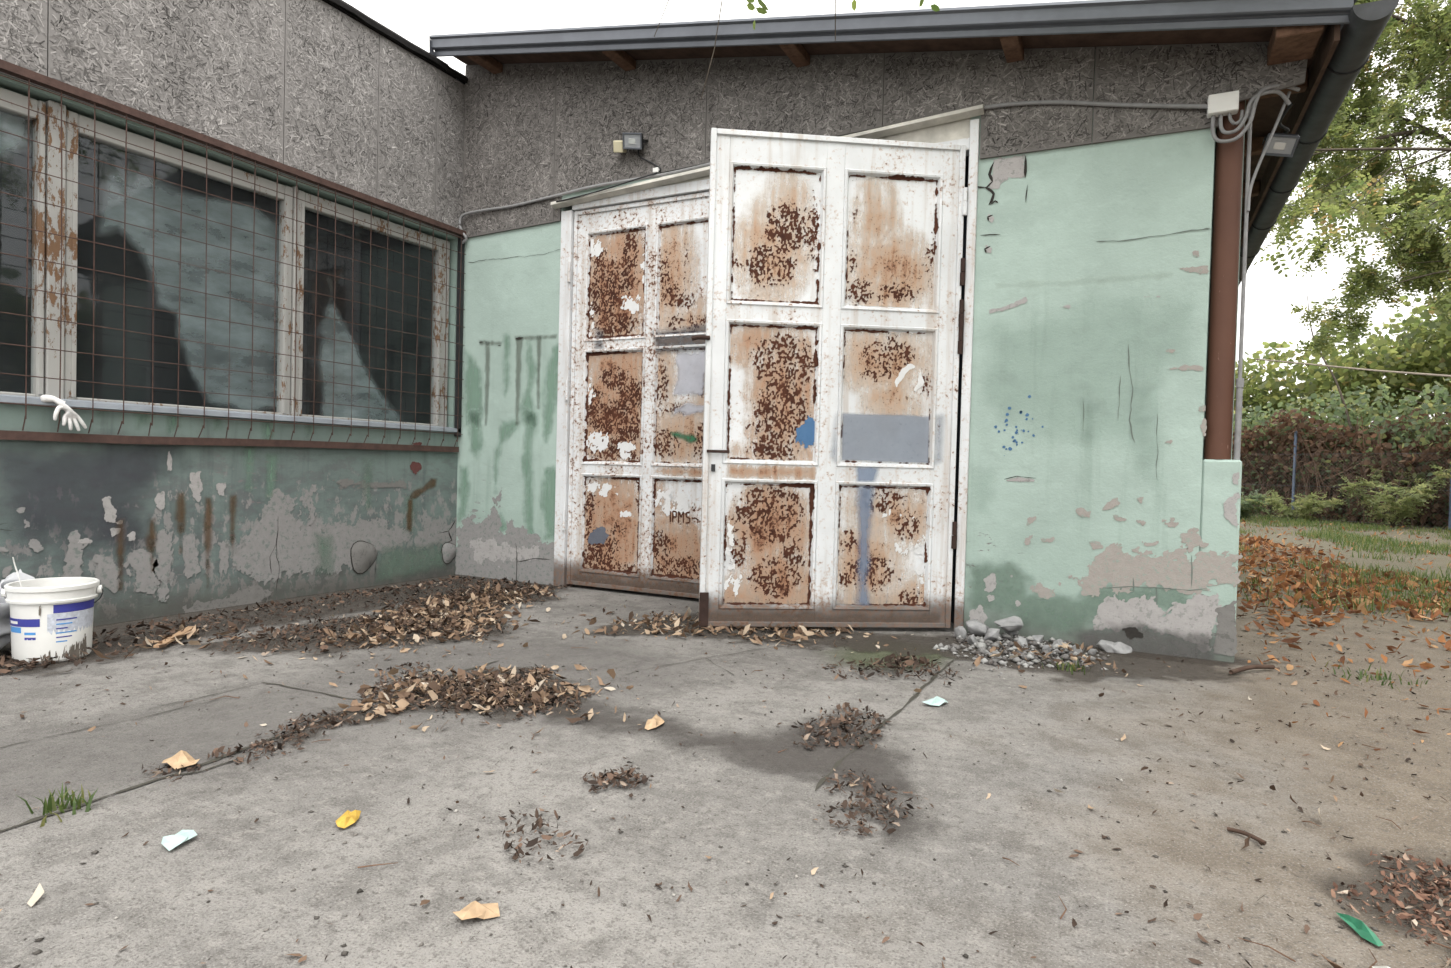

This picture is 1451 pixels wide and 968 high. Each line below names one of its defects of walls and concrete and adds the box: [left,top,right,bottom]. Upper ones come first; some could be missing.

rust [731,165,821,305]
rust [845,174,939,308]
peeling [16,507,44,553]
peeling [189,471,226,502]
flaking render [63,484,554,613]
water stain [467,336,558,536]
rust [582,220,709,579]
rust [711,324,939,623]
flaking render [969,573,1013,624]
flaking render [1015,497,1245,657]